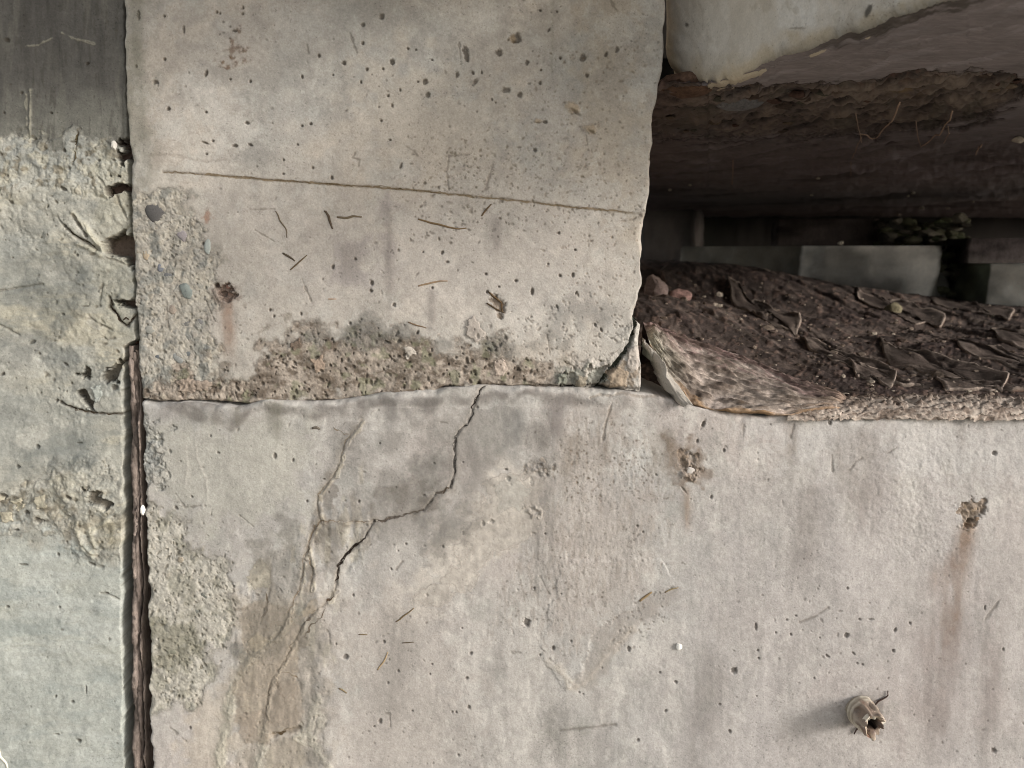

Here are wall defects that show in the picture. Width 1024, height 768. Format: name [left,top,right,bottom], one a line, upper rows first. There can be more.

spalling [111,140,133,162]
spalling [106,184,641,404]
spalling [77,358,126,410]
spalling [0,470,57,537]
spalling [82,487,114,510]
spalling [140,414,239,714]
crack [254,384,514,735]